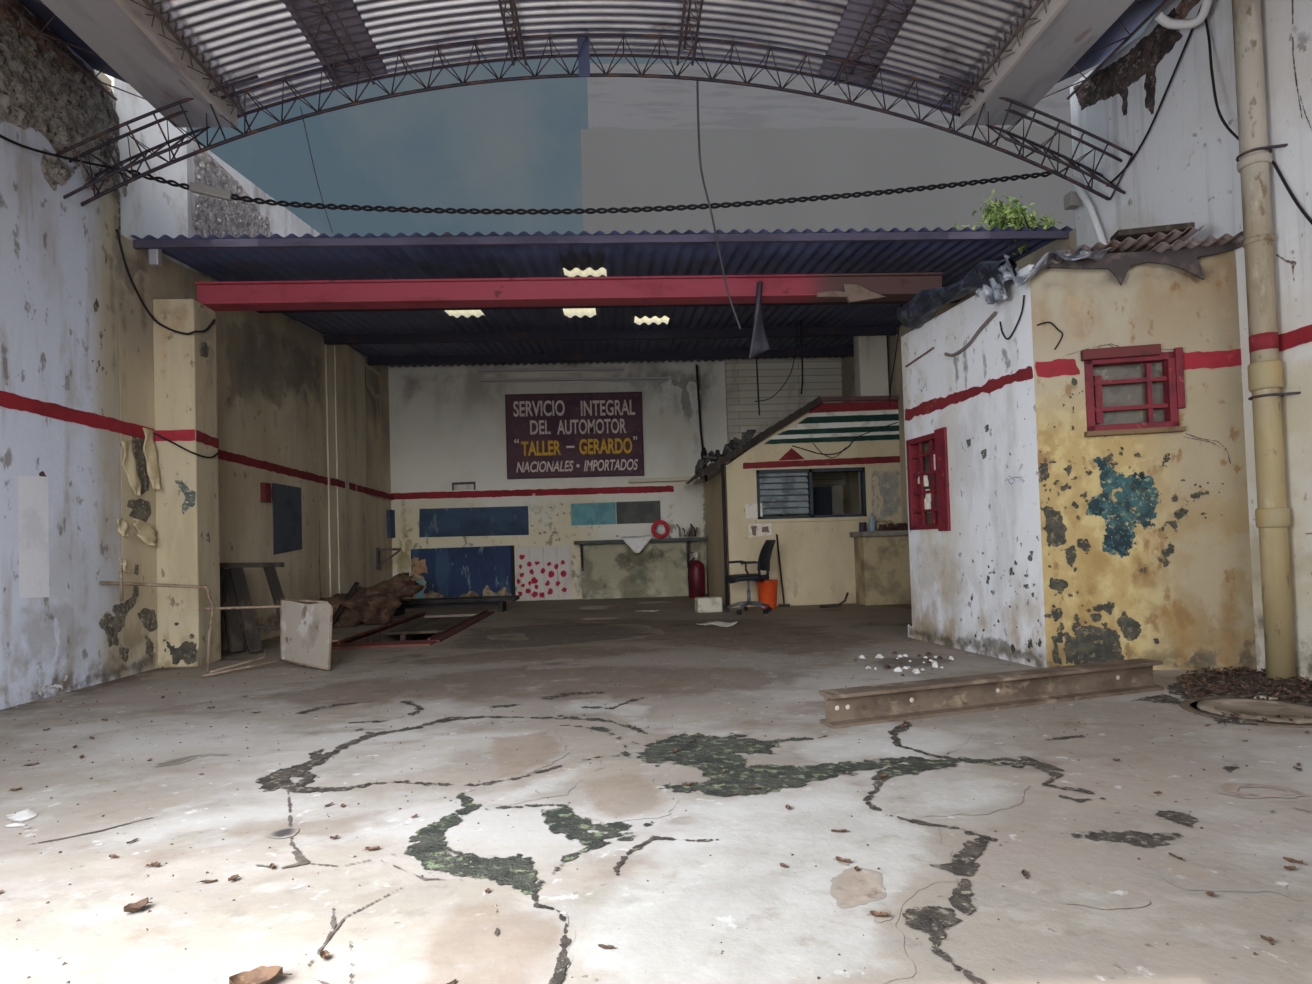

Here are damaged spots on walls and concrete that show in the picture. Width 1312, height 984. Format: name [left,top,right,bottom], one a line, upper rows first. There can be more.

flaking render [0,0,117,191]
flaking render [1073,0,1200,116]
flaking render [192,149,273,238]
flaking render [116,428,196,546]
peeling [970,436,1224,667]
flaking render [99,558,198,668]
crack [888,720,1105,802]
crack [254,691,718,984]
crack [863,776,997,984]